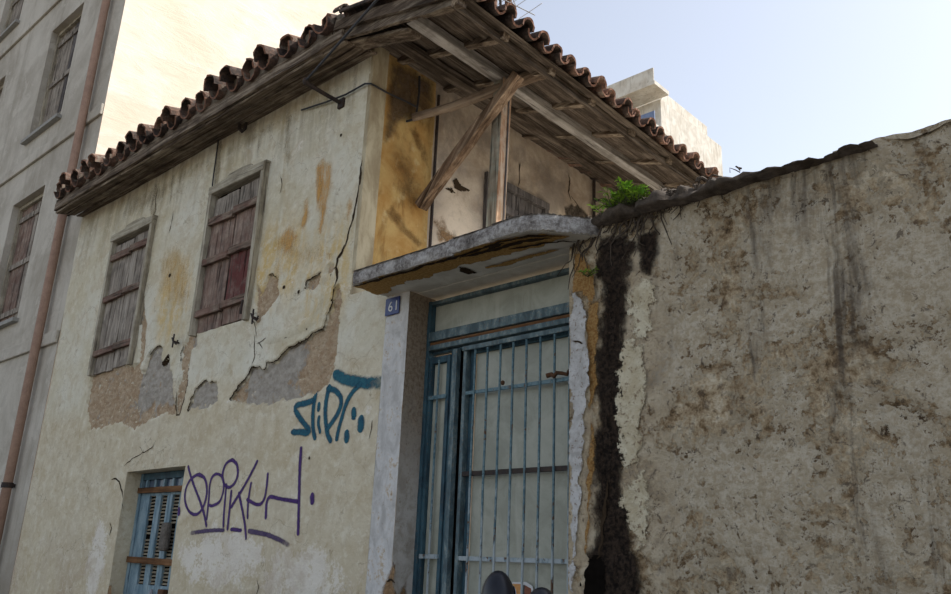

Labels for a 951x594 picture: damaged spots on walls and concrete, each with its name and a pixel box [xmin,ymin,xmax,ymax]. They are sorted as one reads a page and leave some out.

spalling [88,287,343,430]
spalling [256,273,279,323]
spalling [305,272,321,290]
crack [330,162,576,287]
spalling [354,234,569,295]
spalling [565,204,590,218]
peeling [568,292,590,592]
damp [586,229,658,594]